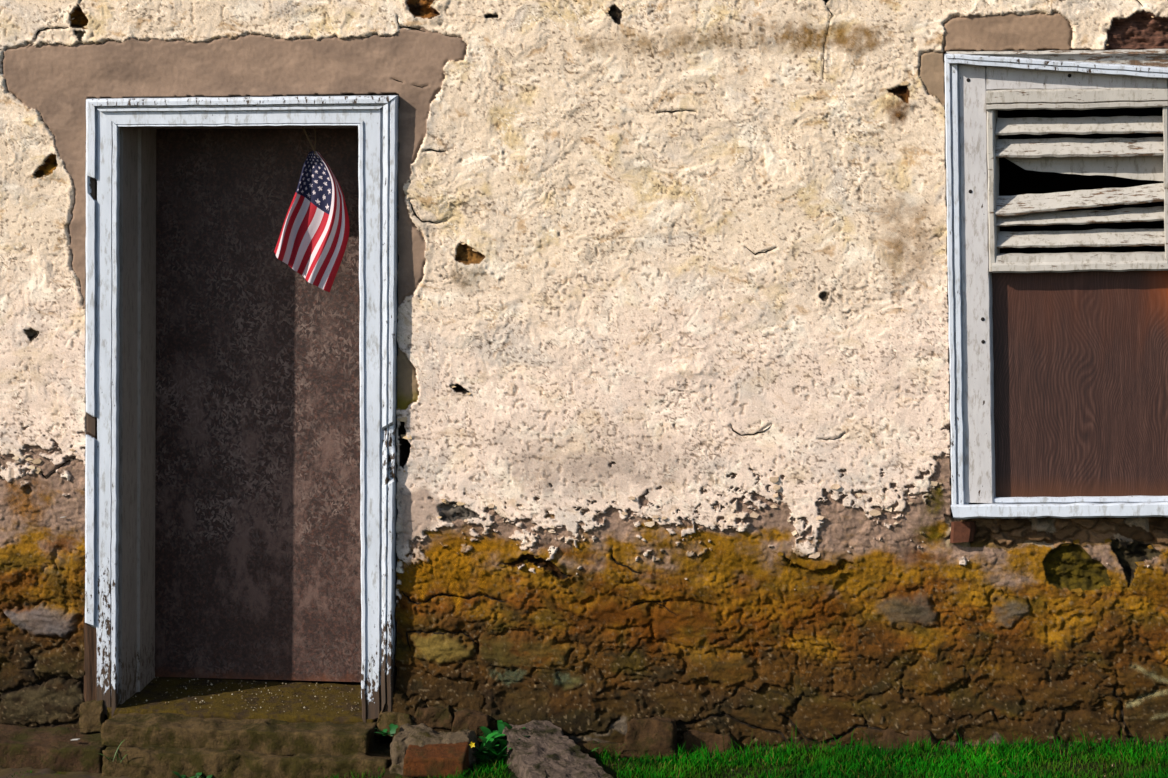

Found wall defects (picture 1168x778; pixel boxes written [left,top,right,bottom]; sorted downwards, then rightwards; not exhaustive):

flaking render [407,0,440,20]
flaking render [1105,10,1168,50]
flaking render [31,154,58,179]
flaking render [450,384,471,395]
flaking render [397,416,412,472]
water stain [401,489,440,543]
flaking render [0,432,85,729]
flaking render [393,425,1168,751]
water stain [1127,666,1167,707]